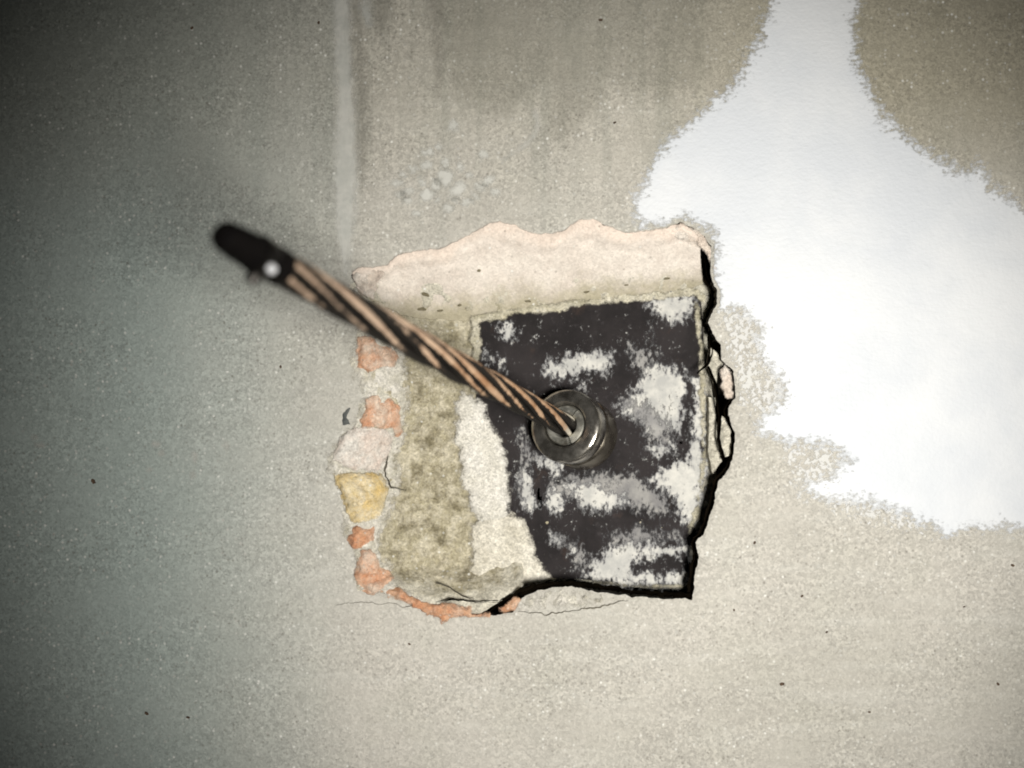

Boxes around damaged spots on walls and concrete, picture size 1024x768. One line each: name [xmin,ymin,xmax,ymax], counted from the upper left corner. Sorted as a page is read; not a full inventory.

spalling [325,219,734,624]
crack [436,249,734,618]